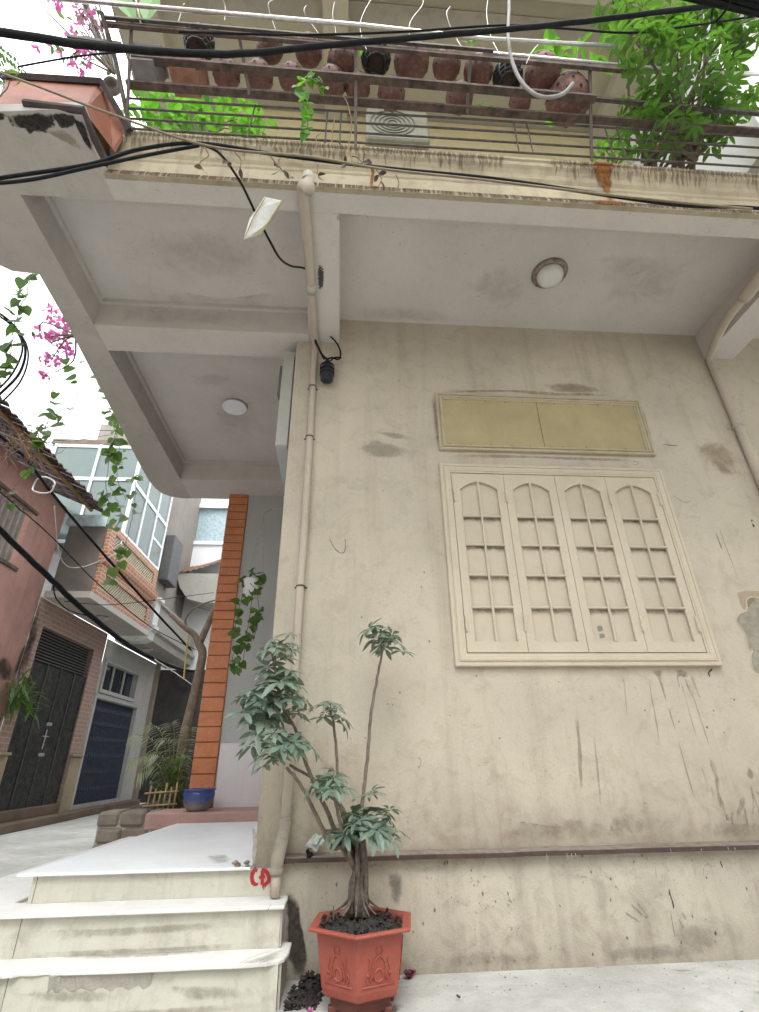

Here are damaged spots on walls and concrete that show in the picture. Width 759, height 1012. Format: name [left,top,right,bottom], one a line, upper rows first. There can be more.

damp [108,169,299,185]
damp [314,182,759,214]
corrosion [594,161,624,204]
peeling [735,596,759,674]